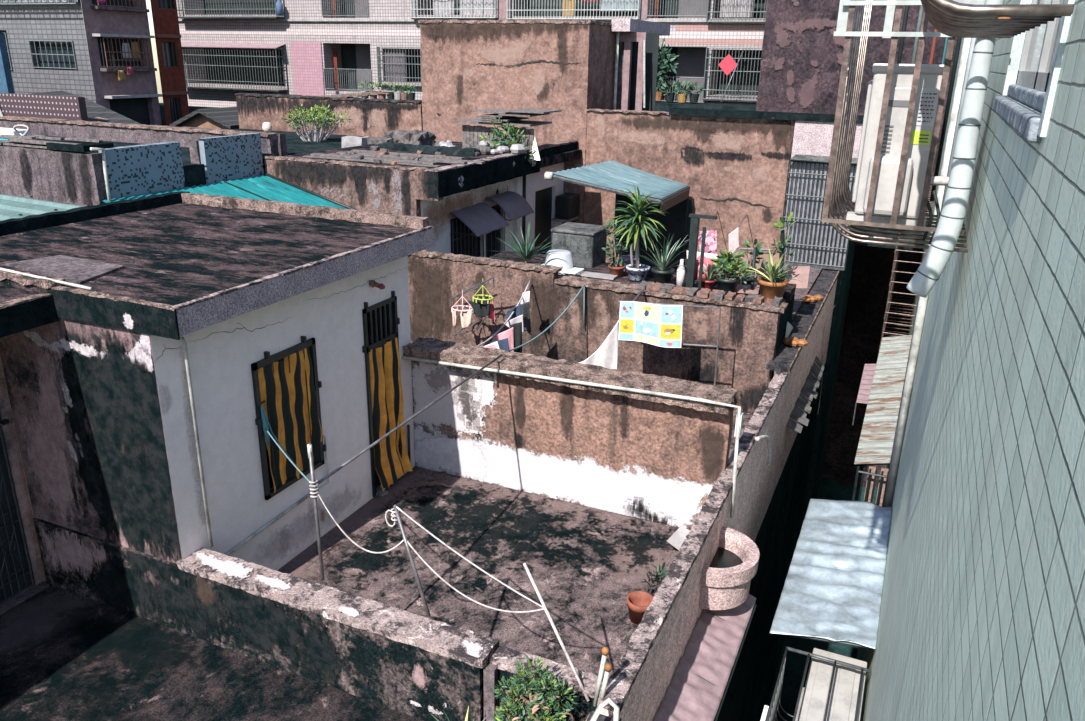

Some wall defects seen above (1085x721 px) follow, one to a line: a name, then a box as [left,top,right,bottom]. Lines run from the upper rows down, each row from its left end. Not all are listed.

crack [477,60,579,69]
peeling [774,18,845,108]
water stain [18,149,33,193]
water stain [58,152,92,205]
flaking render [123,312,153,373]
flaking render [22,330,108,579]
water stain [514,382,525,448]
peeling [412,362,714,528]
water stain [560,385,573,438]
water stain [699,426,725,478]
water stain [0,295,351,721]